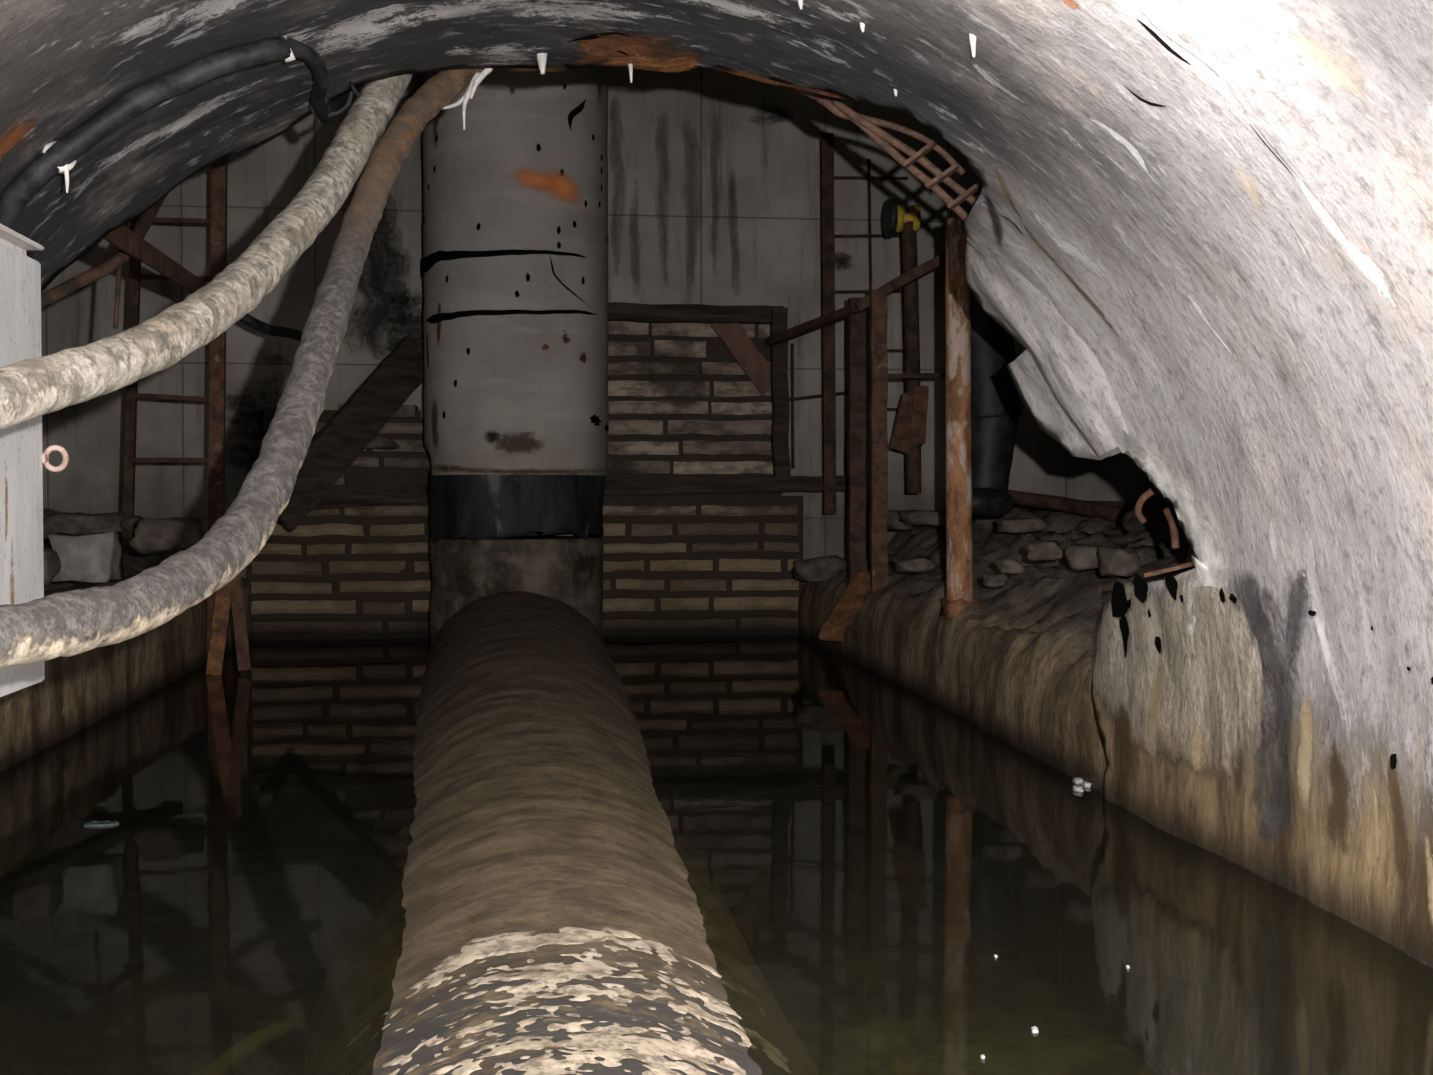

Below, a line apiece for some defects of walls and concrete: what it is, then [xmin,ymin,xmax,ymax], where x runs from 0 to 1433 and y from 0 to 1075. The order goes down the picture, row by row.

rust [511,31,704,72]
rust [723,69,843,98]
damp [973,64,1025,103]
rust [0,119,36,165]
rust [520,171,576,200]
damp [998,176,1113,329]
damp [348,199,424,354]
crack [422,249,597,324]
damp [226,380,278,473]
spalling [1135,488,1155,524]
spalling [1163,507,1180,549]
damp [1116,431,1348,837]